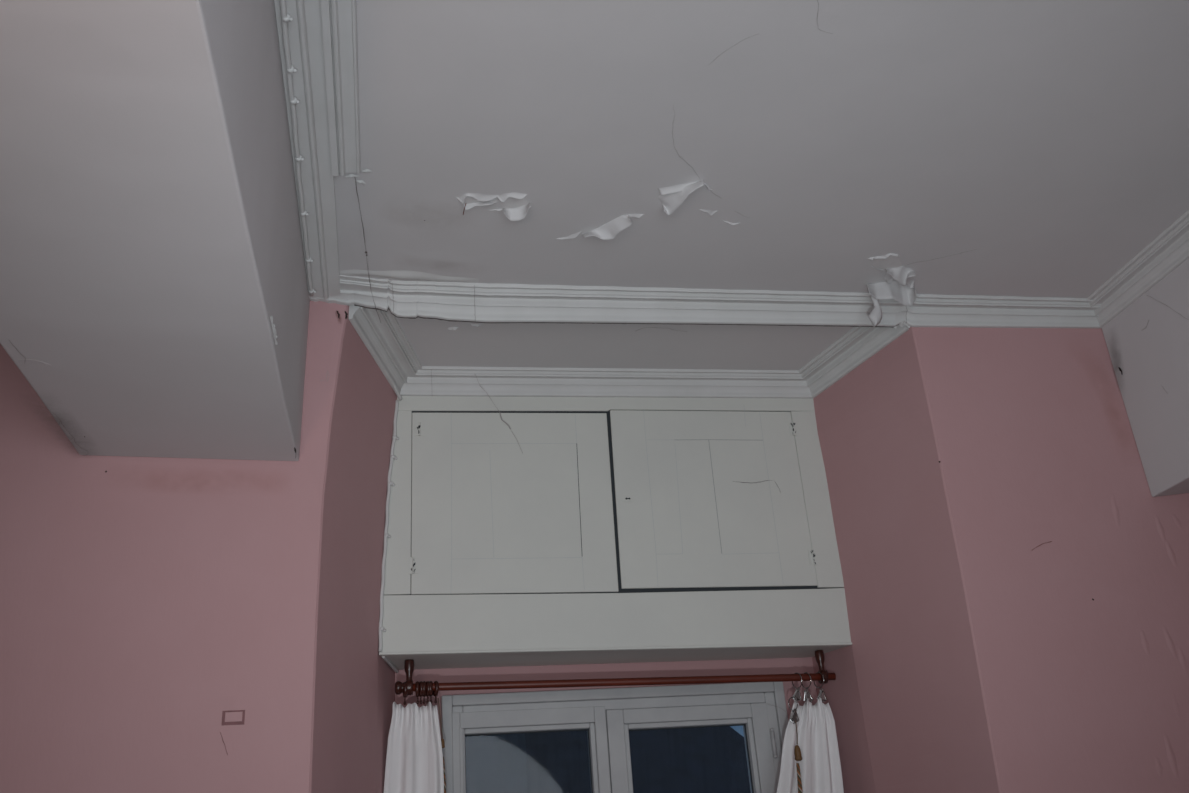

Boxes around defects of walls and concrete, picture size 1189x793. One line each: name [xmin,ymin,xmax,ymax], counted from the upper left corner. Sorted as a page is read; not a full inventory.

peeling [455,192,531,221]
peeling [657,180,713,215]
peeling [557,214,644,240]
peeling [850,253,916,327]
flaking render [354,304,574,331]